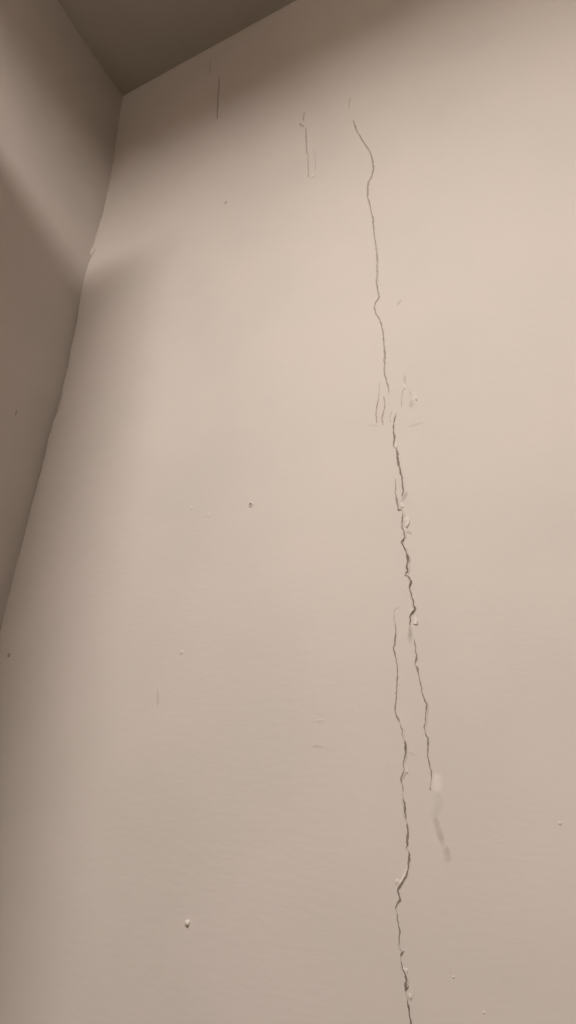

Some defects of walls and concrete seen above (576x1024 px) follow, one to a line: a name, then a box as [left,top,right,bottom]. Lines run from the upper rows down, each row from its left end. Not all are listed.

crack [349,97,432,1024]